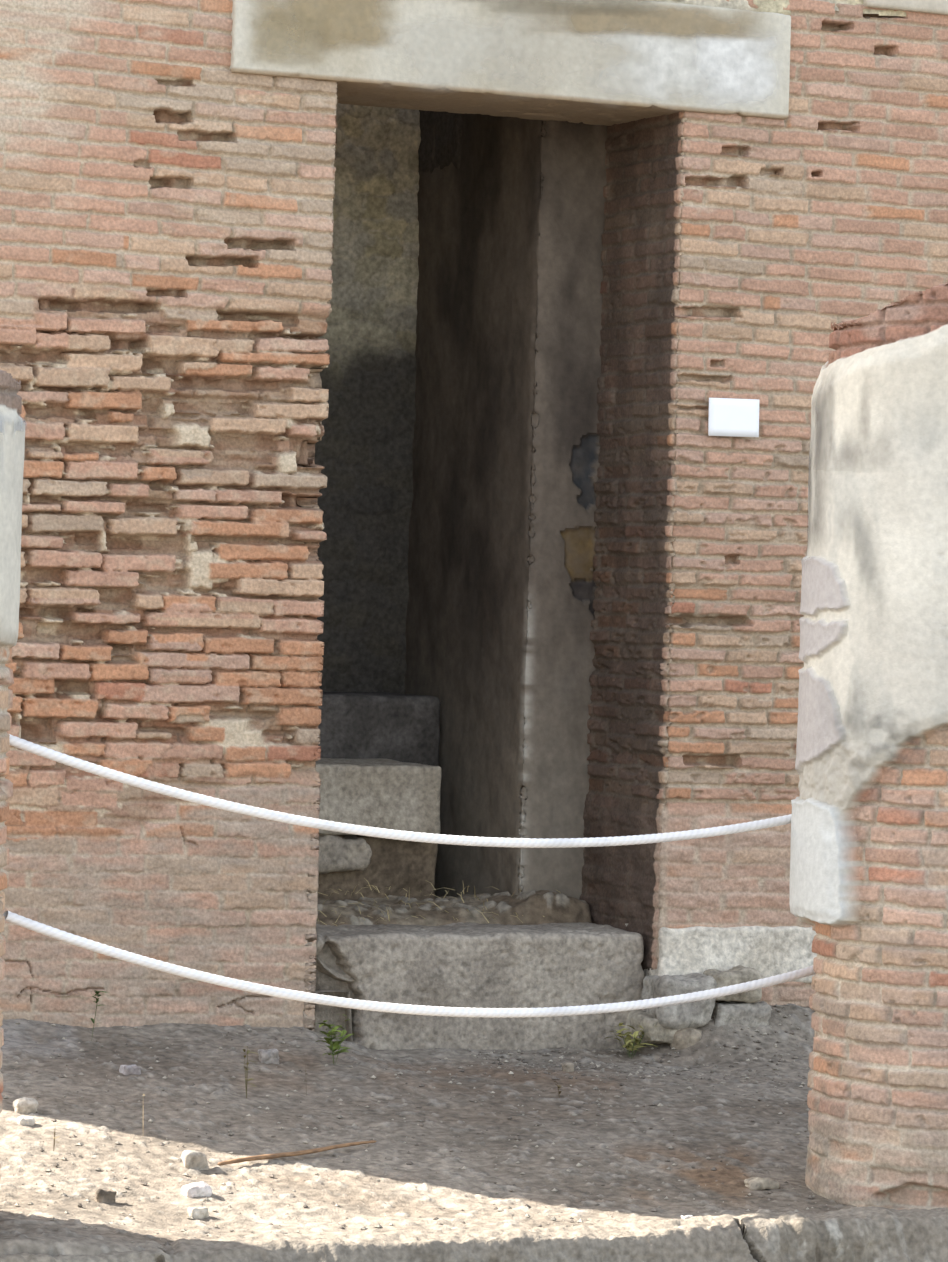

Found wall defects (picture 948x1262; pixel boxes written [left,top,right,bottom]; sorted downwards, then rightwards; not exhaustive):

spalling [153,109,239,143]
spalling [134,160,194,190]
spalling [186,239,296,268]
spalling [0,290,330,786]
crack [735,1218,747,1239]
crack [157,1254,165,1262]